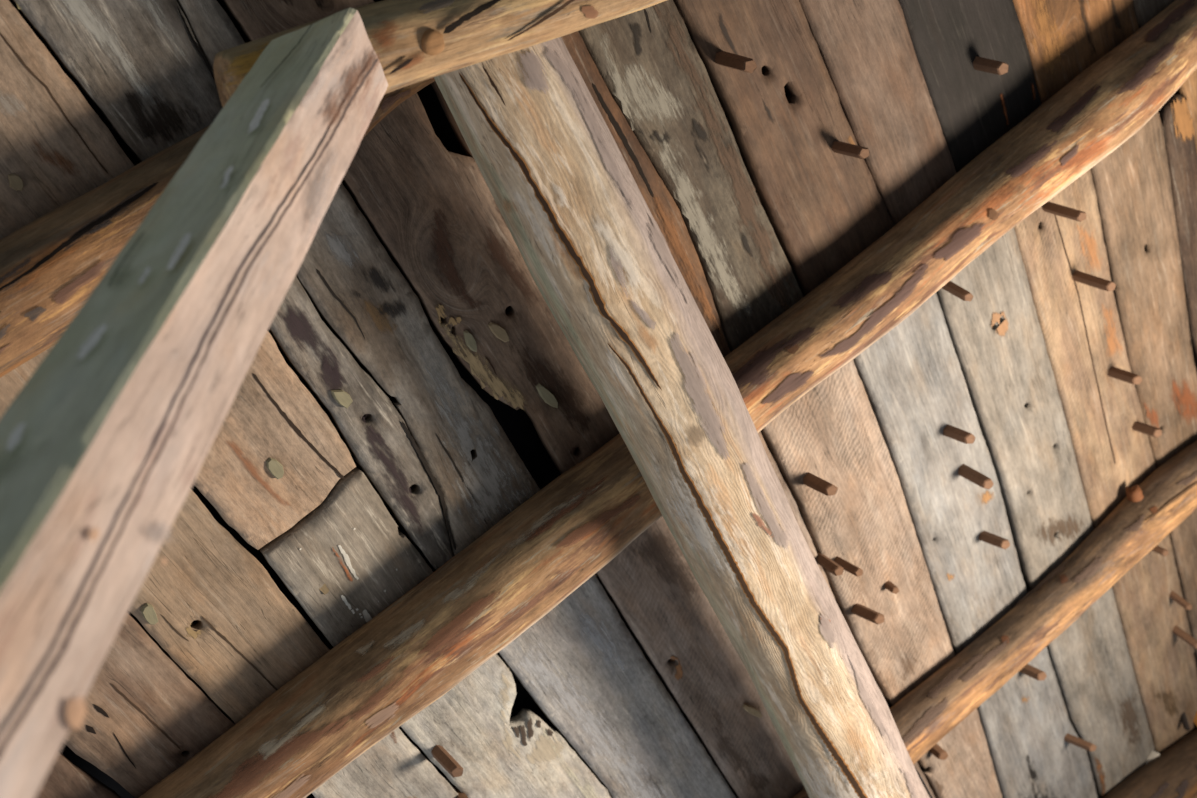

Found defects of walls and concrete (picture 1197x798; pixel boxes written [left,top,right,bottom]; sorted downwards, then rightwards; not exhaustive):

crack [459,67,868,798]